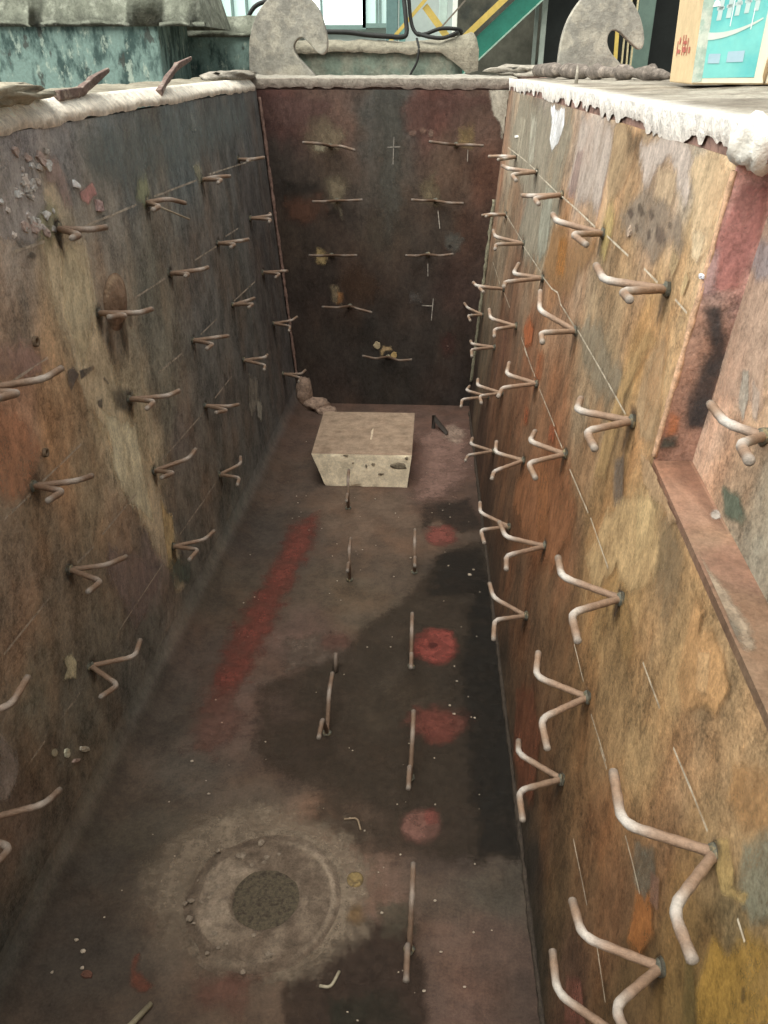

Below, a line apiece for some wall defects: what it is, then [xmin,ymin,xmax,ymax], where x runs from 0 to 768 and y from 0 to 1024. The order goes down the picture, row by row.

corrosion [691,154,728,261]
corrosion [628,887,652,953]